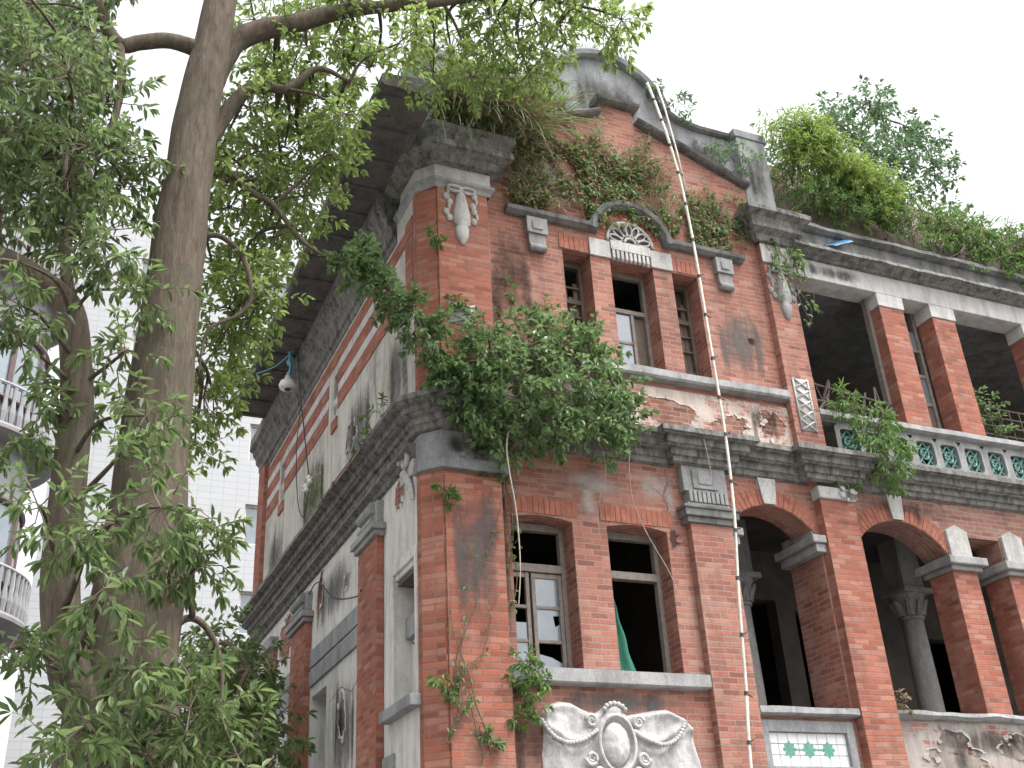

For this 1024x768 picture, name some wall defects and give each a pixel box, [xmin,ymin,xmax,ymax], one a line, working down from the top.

peeling [616,394,787,444]
flaking render [922,726,1024,768]